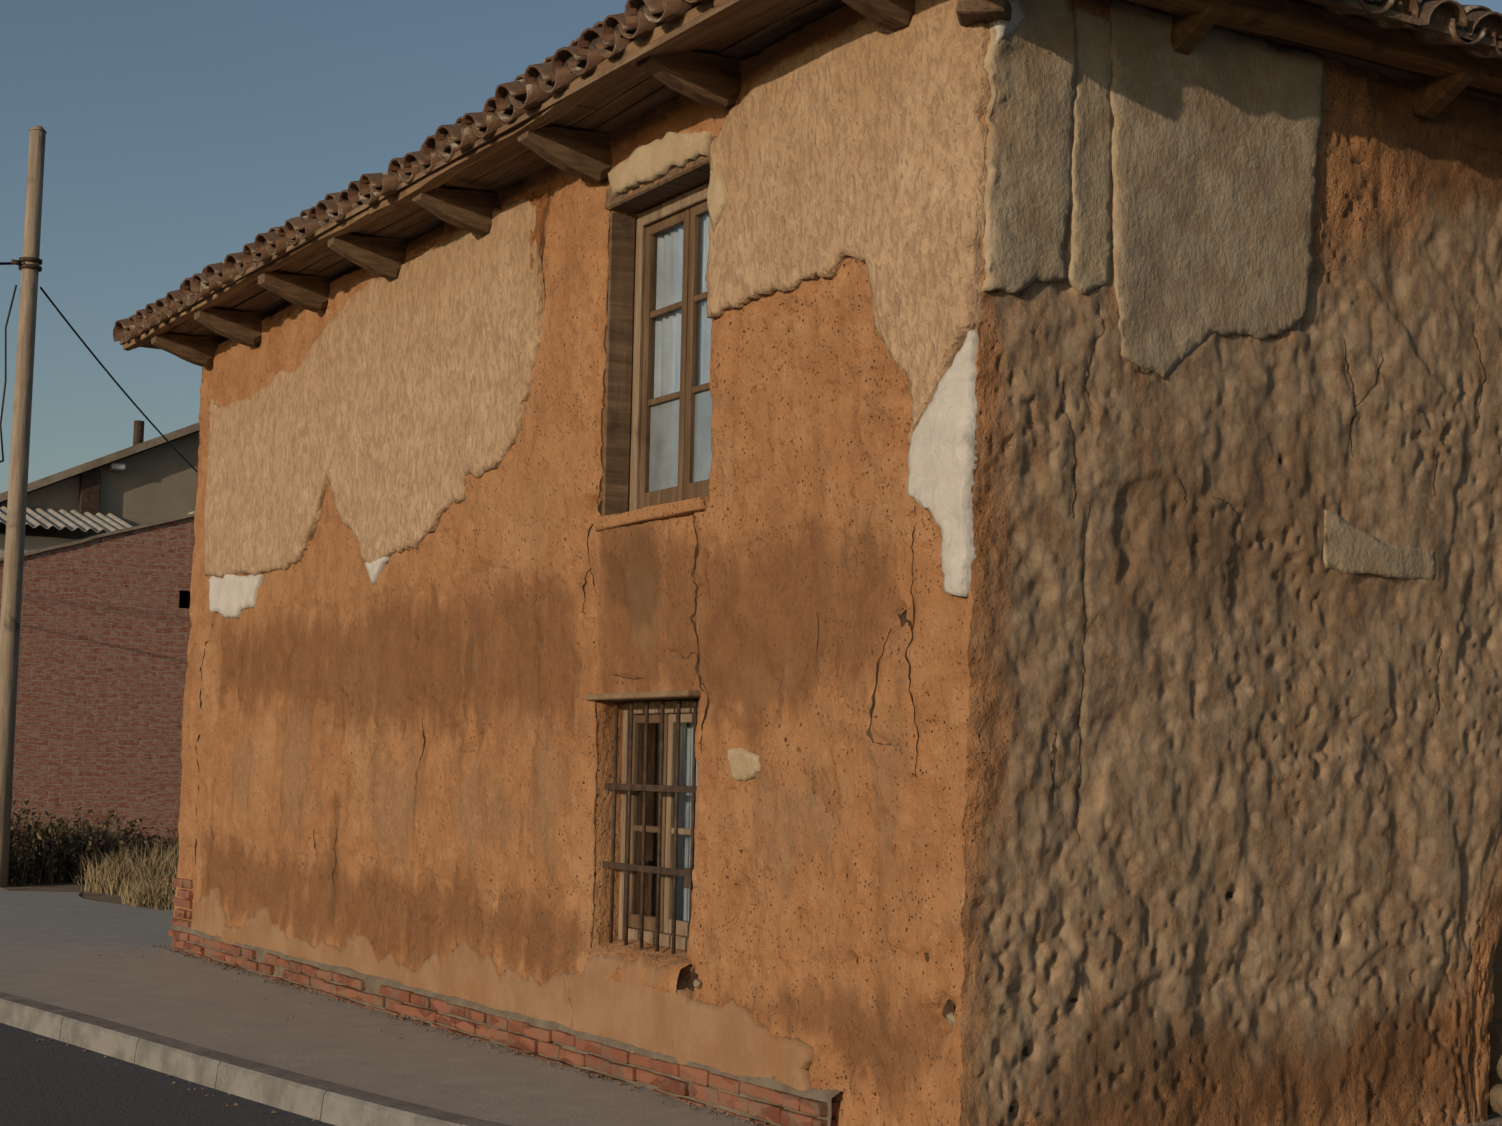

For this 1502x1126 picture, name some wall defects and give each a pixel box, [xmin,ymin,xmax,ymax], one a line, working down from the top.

peeling [608,0,1324,597]
crack [671,515,709,753]
crack [867,506,919,778]
crack [1051,302,1104,840]
spalling [190,887,814,1091]